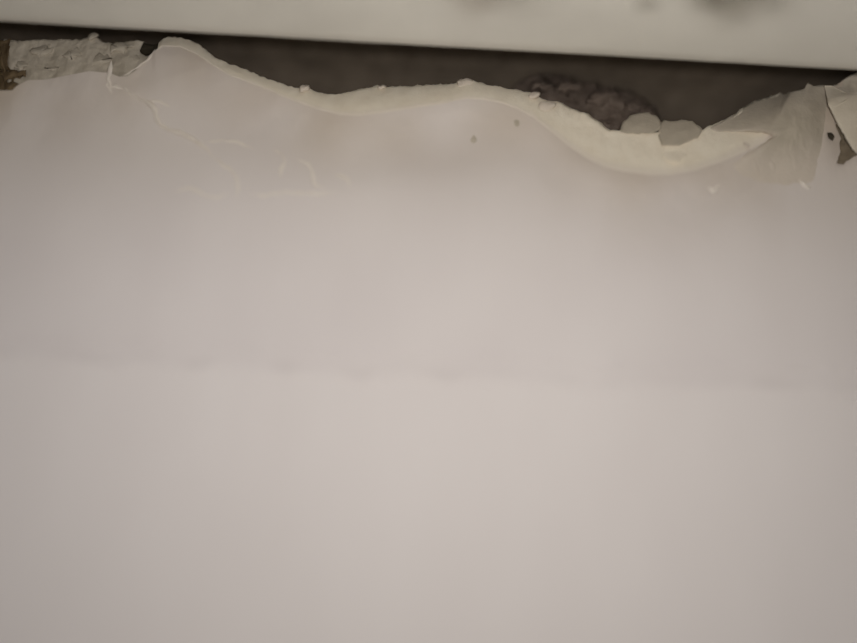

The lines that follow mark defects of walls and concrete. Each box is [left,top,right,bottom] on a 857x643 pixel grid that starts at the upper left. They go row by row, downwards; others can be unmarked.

spalling [4,32,788,175]
peeling [824,73,857,164]